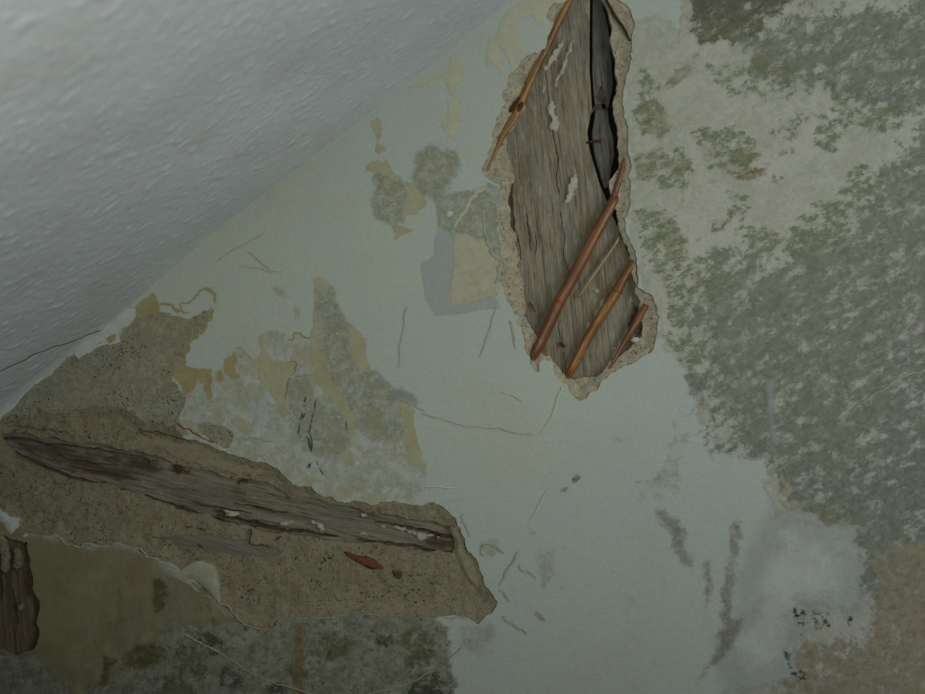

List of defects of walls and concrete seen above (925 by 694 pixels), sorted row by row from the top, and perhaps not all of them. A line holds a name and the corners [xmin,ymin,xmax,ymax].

flaking render [0,275,497,694]
leakage [87,613,458,694]
peeling [366,0,925,694]
leakage [629,0,925,679]